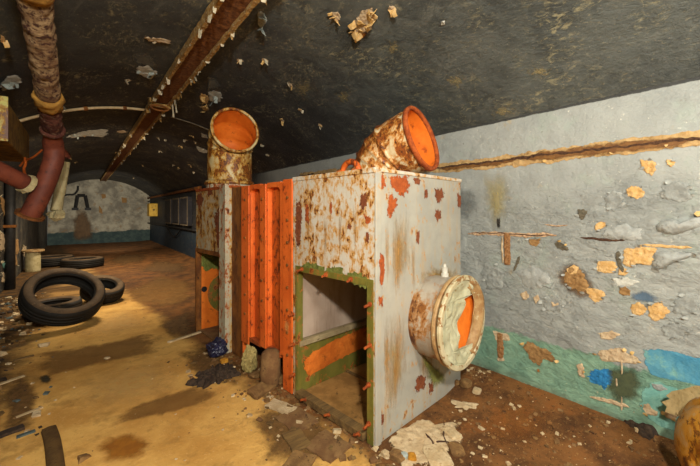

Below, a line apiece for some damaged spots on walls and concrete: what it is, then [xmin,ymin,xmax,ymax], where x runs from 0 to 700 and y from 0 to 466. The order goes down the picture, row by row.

peeling [327,8,378,43]
peeling [125,54,157,85]
peeling [66,129,108,139]
spalling [423,130,700,176]
spalling [300,167,352,176]
peeling [604,186,645,211]
spalling [560,265,605,304]
spalling [594,244,699,340]
spalling [520,342,559,366]
damp [609,362,640,411]
peeling [577,330,700,430]